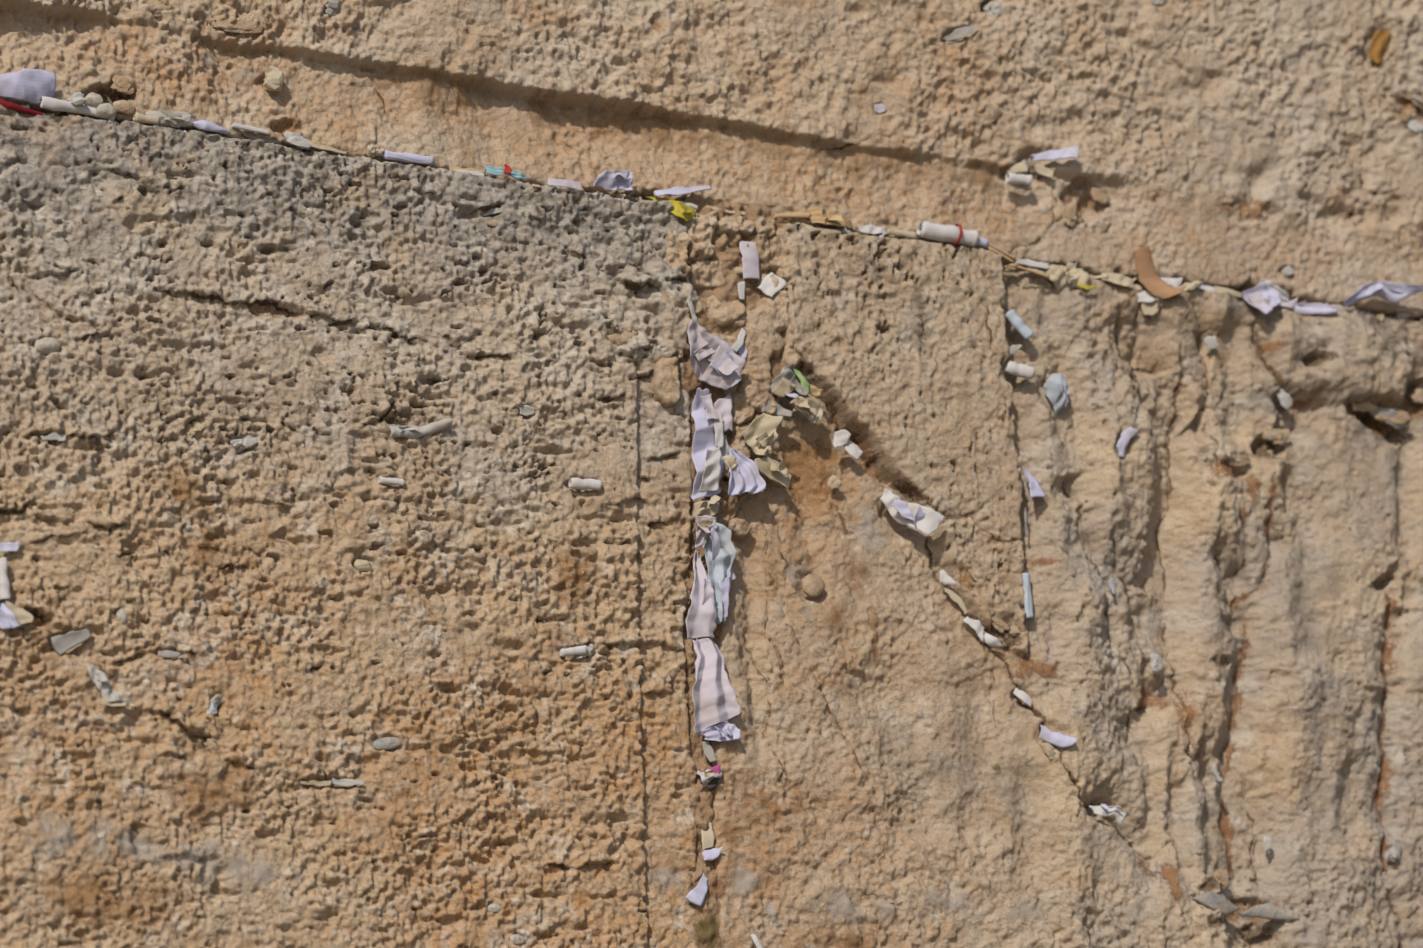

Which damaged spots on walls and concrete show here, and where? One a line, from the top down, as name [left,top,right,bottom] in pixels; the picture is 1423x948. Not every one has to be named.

crack [1253,332,1284,389]
crack [745,530,861,772]
crack [1089,314,1257,884]
crack [1214,465,1286,703]
crack [1375,663,1387,827]